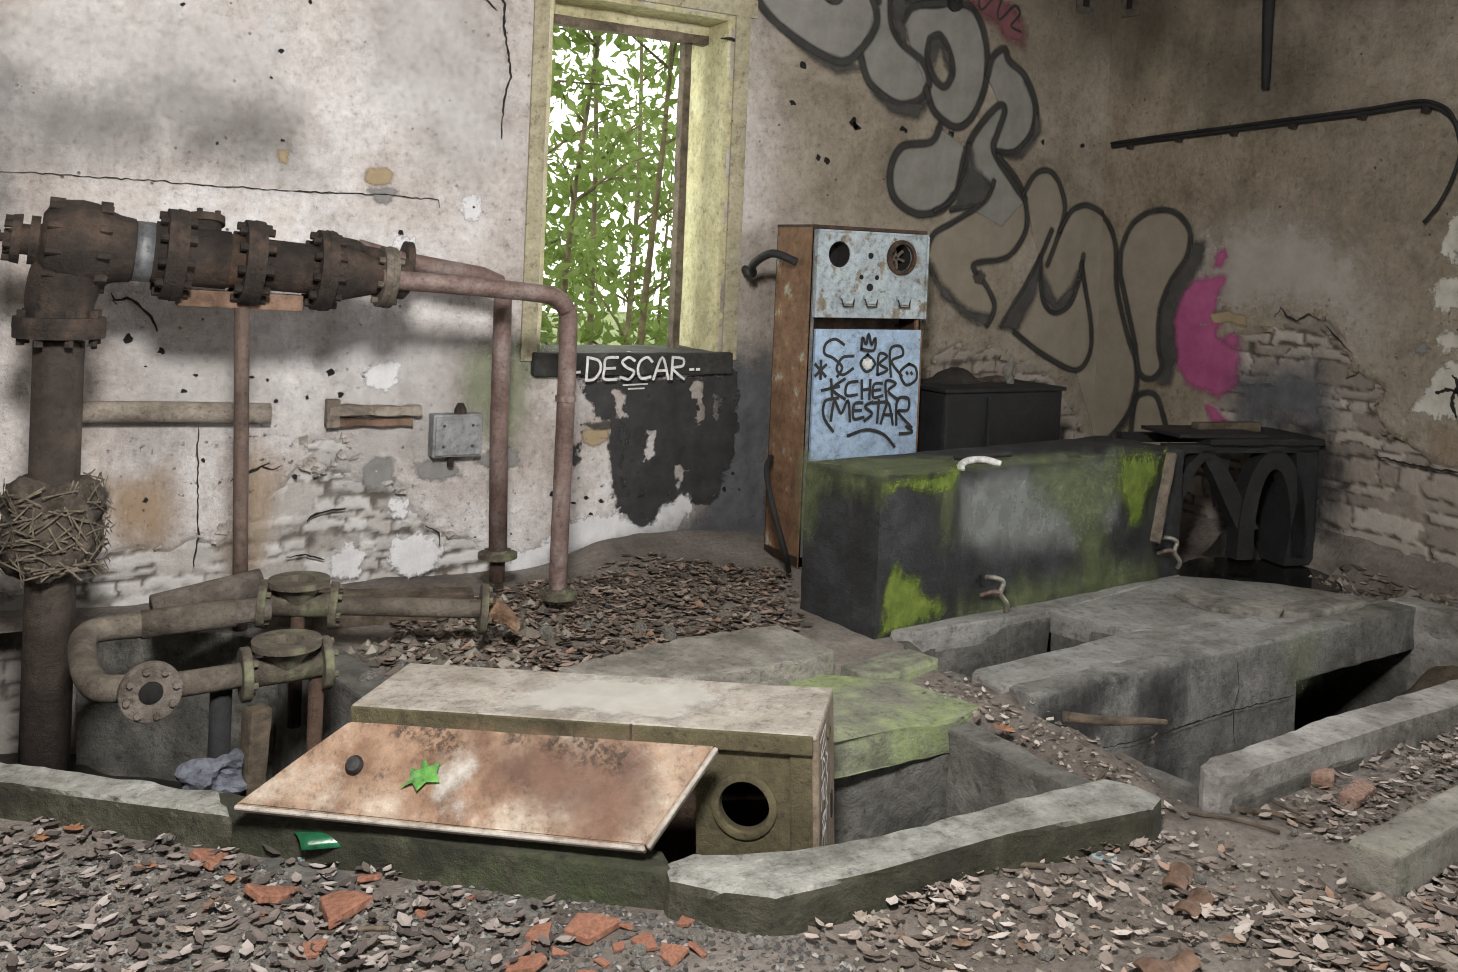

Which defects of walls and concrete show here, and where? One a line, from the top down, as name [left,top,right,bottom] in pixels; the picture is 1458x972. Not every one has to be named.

crack [486,0,512,140]
flaking render [76,432,490,608]
peeling [570,370,741,528]
leakage [971,468,1115,541]
flaking render [1181,466,1224,519]
flaking render [1200,293,1458,569]
flaking render [0,631,22,754]